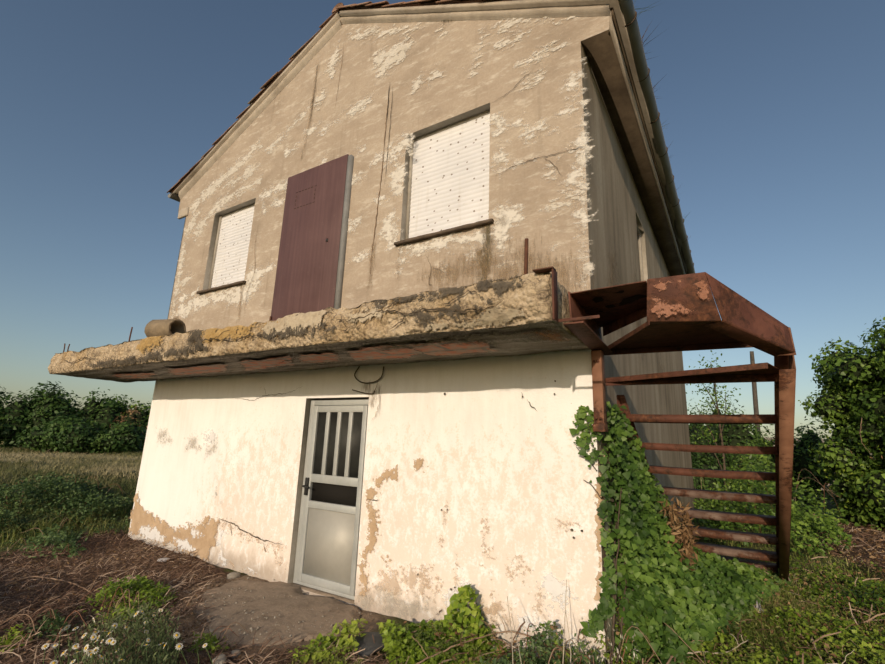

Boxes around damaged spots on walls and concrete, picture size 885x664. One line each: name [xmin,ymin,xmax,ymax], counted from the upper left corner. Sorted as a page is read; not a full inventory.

peeling [348,23,425,77]
peeling [171,90,373,318]
crack [369,86,393,284]
peeling [351,133,415,205]
peeling [379,201,524,274]
peeling [538,59,594,237]
spalling [261,310,327,337]
flaking render [240,340,498,371]
spalling [422,305,525,332]
peeling [128,493,283,567]
crack [221,519,283,553]
peeling [358,464,469,607]